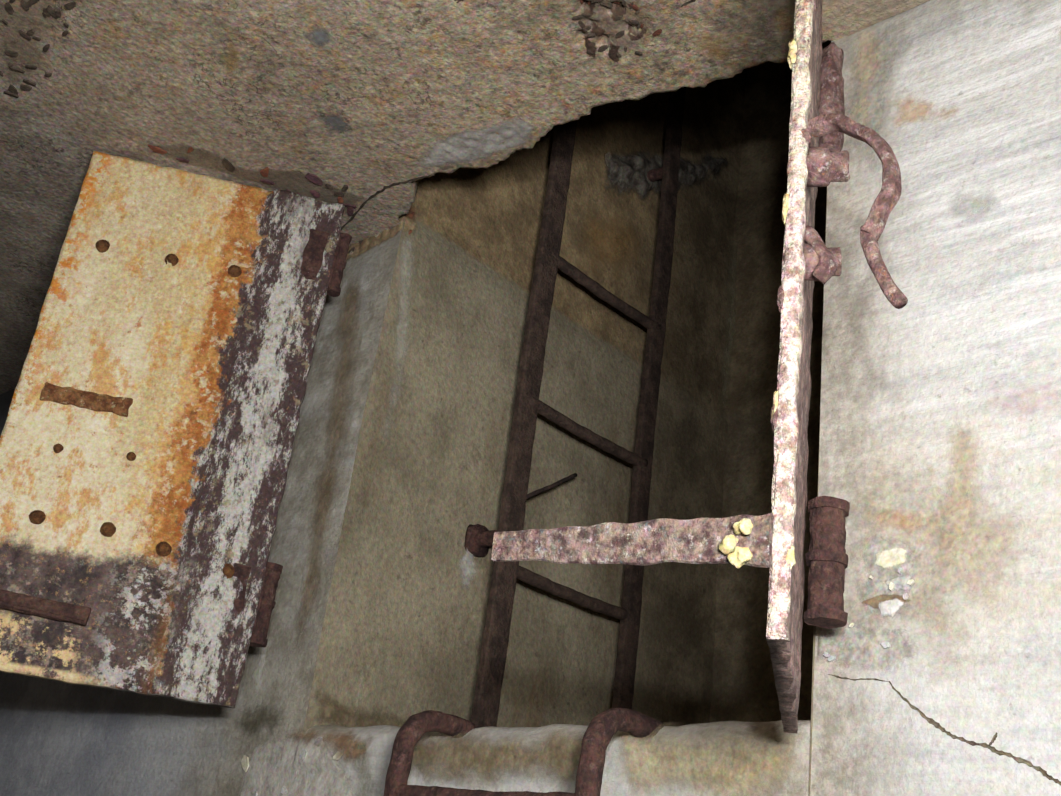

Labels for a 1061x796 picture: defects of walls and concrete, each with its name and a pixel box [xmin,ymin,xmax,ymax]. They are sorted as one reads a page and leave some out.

peeling [2,0,76,52]
spalling [572,0,662,62]
peeling [0,50,52,98]
crack [341,175,434,230]
peeling [862,536,916,616]
peeling [817,623,913,669]
crack [828,674,1061,785]